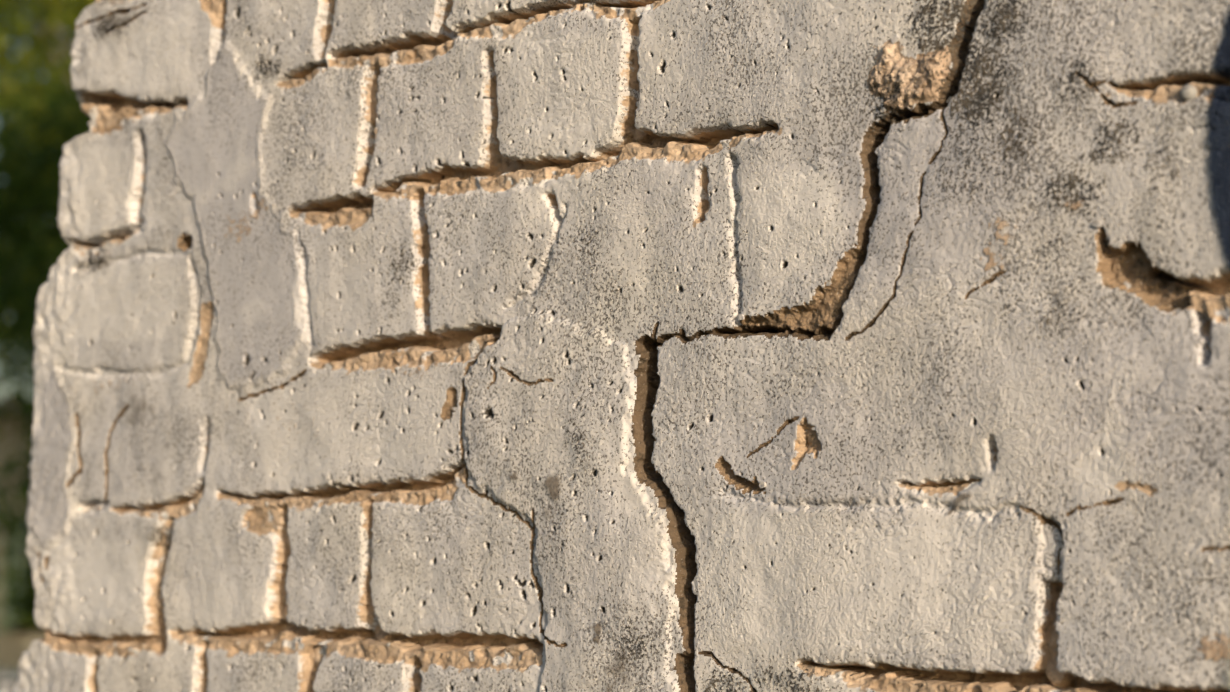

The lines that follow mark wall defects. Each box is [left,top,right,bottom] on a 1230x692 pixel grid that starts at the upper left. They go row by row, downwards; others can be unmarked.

spalling [867,35,952,113]
crack [965,270,1006,299]
peeling [979,217,1016,271]
spalling [1092,220,1202,315]
crack [631,0,984,692]
crack [66,404,129,505]
crack [459,337,567,648]
spalling [715,456,767,494]
spalling [791,417,822,470]